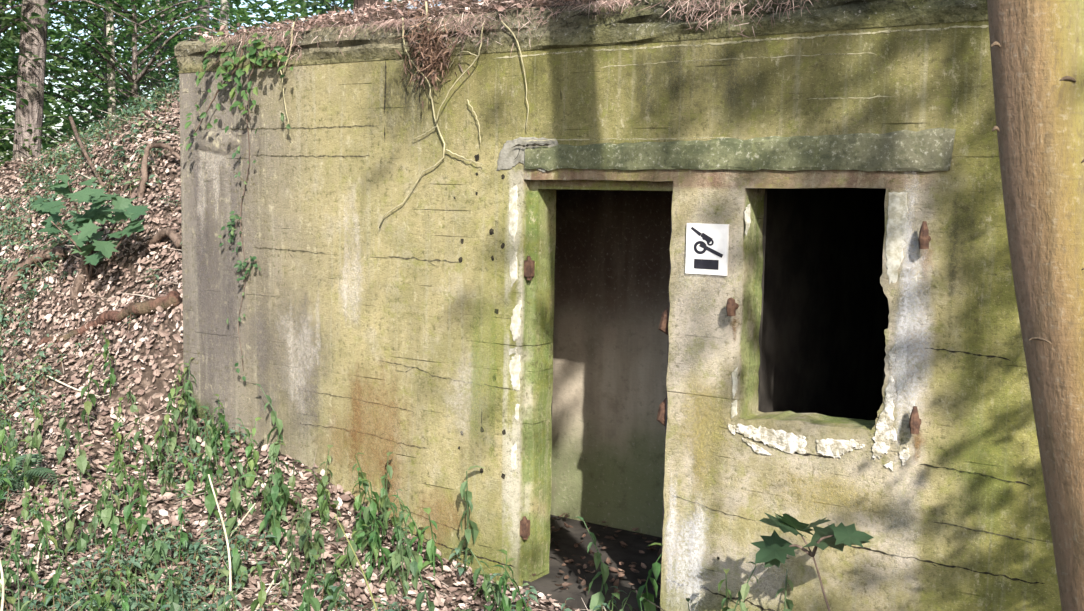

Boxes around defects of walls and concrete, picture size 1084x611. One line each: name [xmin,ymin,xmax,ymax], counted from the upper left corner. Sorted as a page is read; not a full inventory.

peeling [728,192,919,471]
crack [920,464,1030,486]
crack [845,545,1045,584]
crack [666,579,775,611]